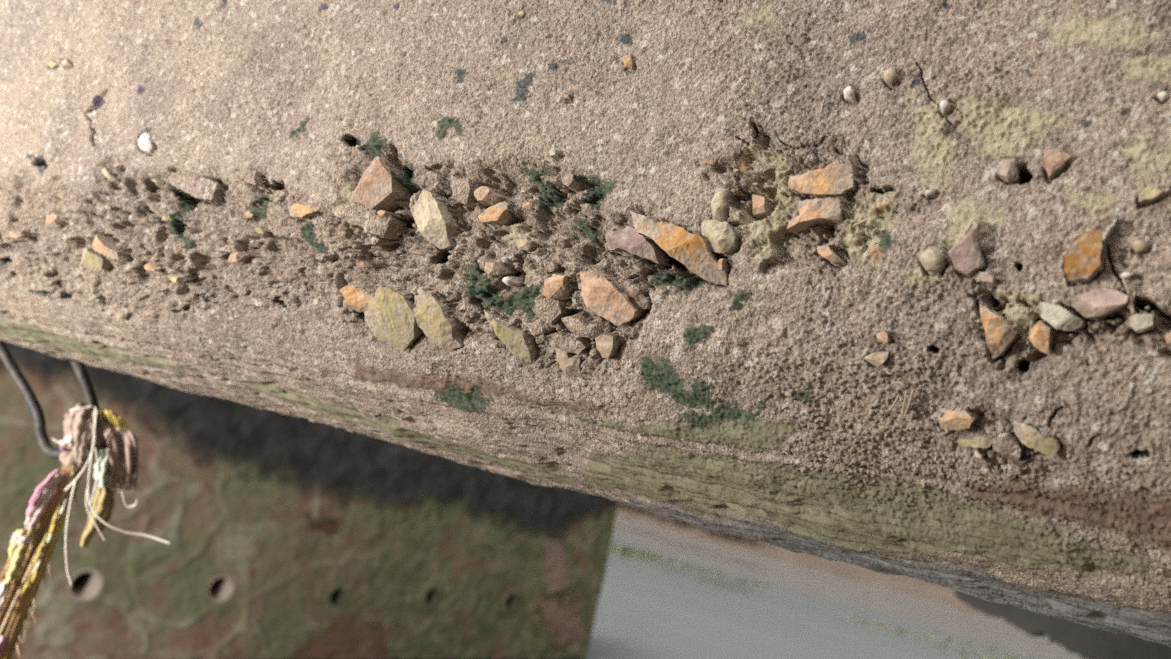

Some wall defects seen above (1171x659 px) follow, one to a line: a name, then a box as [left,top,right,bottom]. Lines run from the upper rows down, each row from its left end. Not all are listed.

spalling [0,131,944,379]
crack [1108,250,1171,321]
spalling [976,287,1171,381]
spalling [938,406,1064,480]